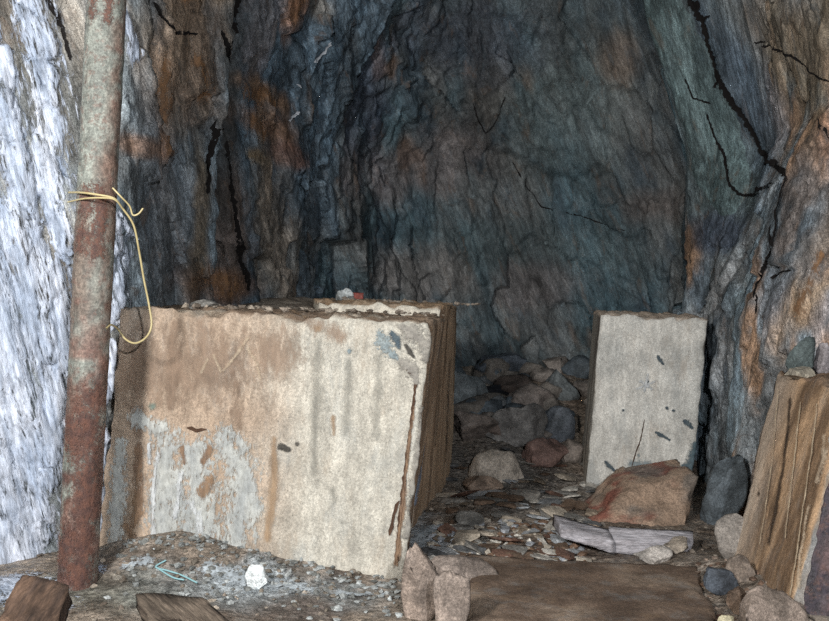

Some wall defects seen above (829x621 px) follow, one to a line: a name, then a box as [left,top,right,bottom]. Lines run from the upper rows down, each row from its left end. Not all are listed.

rust [88,0,115,25]
rust [73,178,111,263]
damp [107,321,300,427]
rust [56,373,107,591]
damp [100,427,111,531]
damp [123,423,160,539]
damp [173,446,214,534]
damp [120,556,156,569]
damp [197,560,246,589]
damp [257,575,320,594]